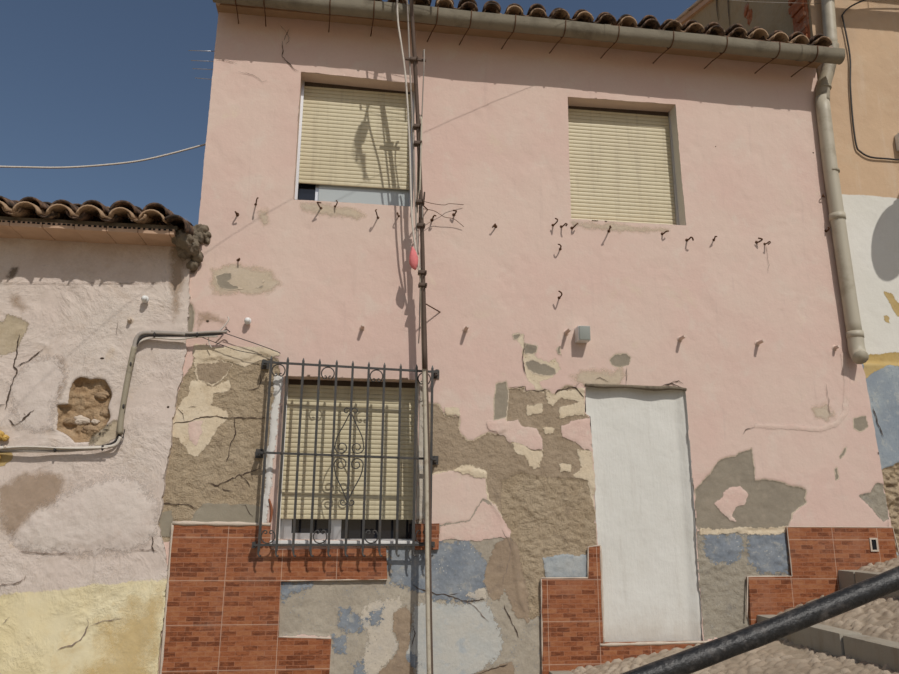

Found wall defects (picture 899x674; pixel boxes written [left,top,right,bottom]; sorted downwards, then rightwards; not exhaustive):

peeling [0,314,29,355]
crack [1,335,43,425]
spalling [57,377,124,446]
crack [175,406,262,515]
peeling [159,344,280,542]
spalling [215,272,244,290]
peeling [279,333,687,674]
peeling [694,448,807,641]
flaking render [860,462,899,554]
peeling [884,291,899,323]